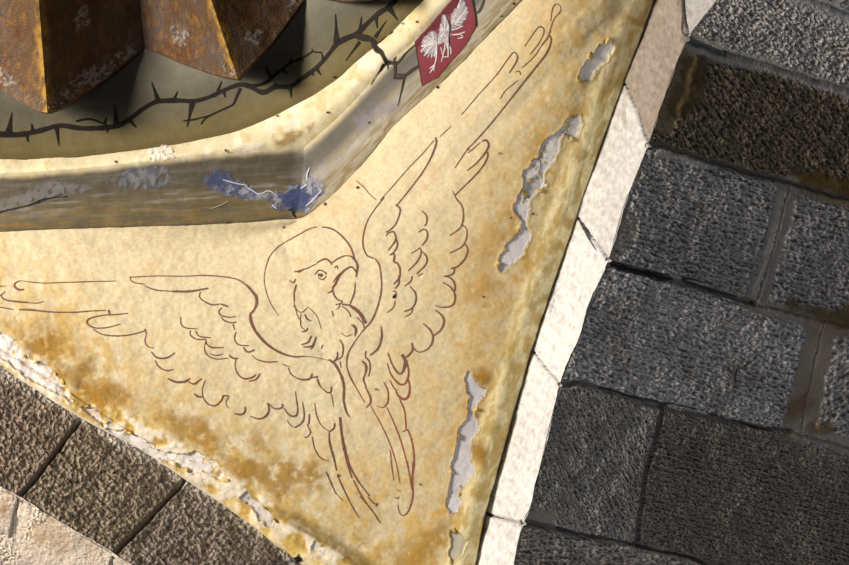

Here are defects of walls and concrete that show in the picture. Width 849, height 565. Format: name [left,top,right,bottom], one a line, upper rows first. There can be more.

flaking render [576,37,613,82]
flaking render [493,114,581,272]
flaking render [0,333,229,483]
flaking render [240,492,277,527]
flaking render [446,371,486,513]